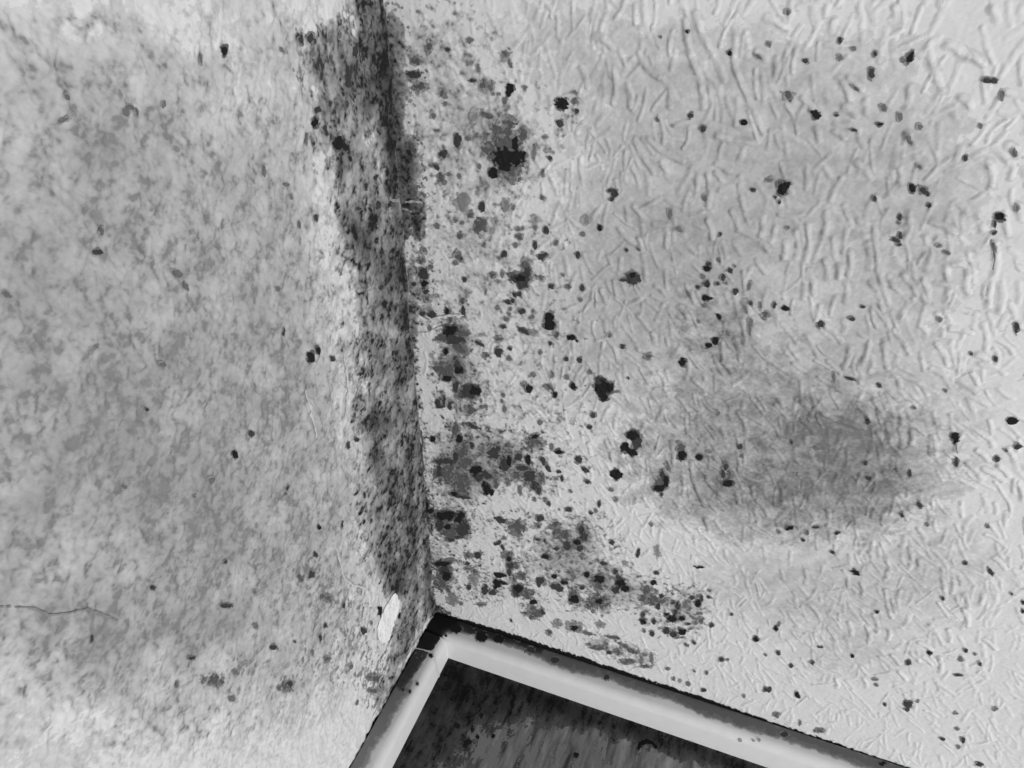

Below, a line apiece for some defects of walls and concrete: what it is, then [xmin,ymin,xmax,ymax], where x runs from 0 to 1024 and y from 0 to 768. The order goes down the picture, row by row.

damp [271,0,1024,768]